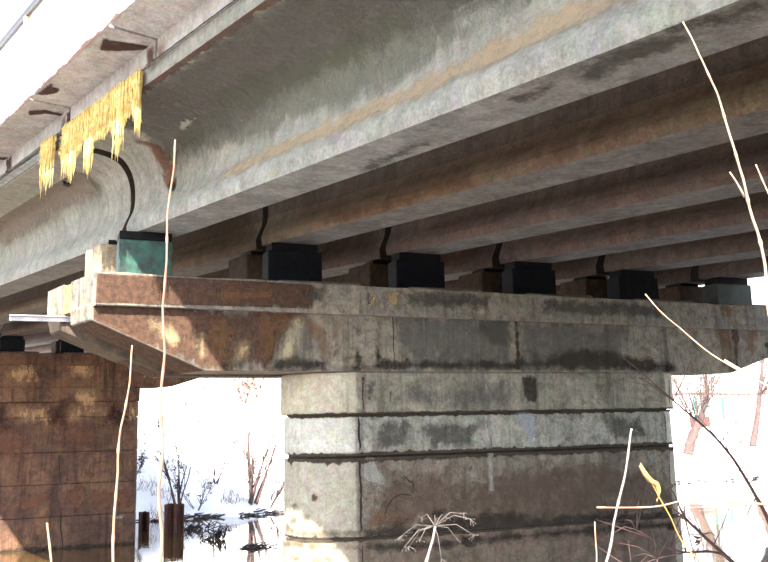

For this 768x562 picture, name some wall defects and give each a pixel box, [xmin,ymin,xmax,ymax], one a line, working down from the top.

rust [136,141,175,193]
water stain [388,292,489,309]
water stain [544,299,662,319]
rust [73,273,326,378]
water stain [276,357,324,371]
water stain [351,317,676,402]
rust [718,329,755,372]
water stain [378,420,410,449]
water stain [424,425,475,447]
water stain [606,416,645,438]
crack [384,476,416,517]